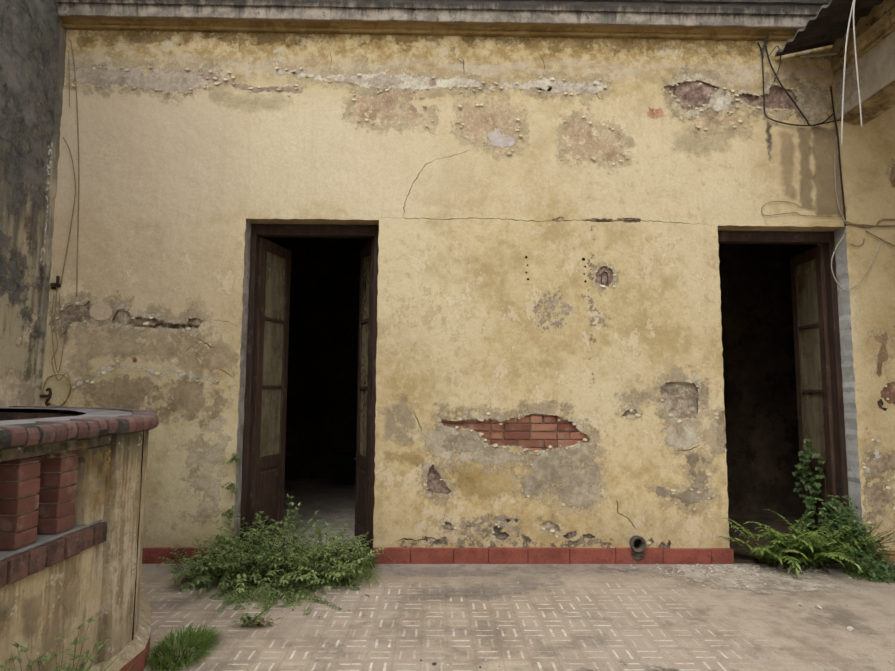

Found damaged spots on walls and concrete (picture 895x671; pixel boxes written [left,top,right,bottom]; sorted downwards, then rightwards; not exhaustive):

water stain [0,0,60,214]
peeling [199,67,610,131]
spalling [647,65,809,130]
crack [382,150,708,225]
water stain [795,86,844,215]
water stain [0,231,43,323]
spalling [50,291,212,345]
peeling [874,326,895,411]
flaking render [434,400,600,465]
spalling [650,367,727,460]
peeling [656,464,715,510]
peeling [400,515,614,550]